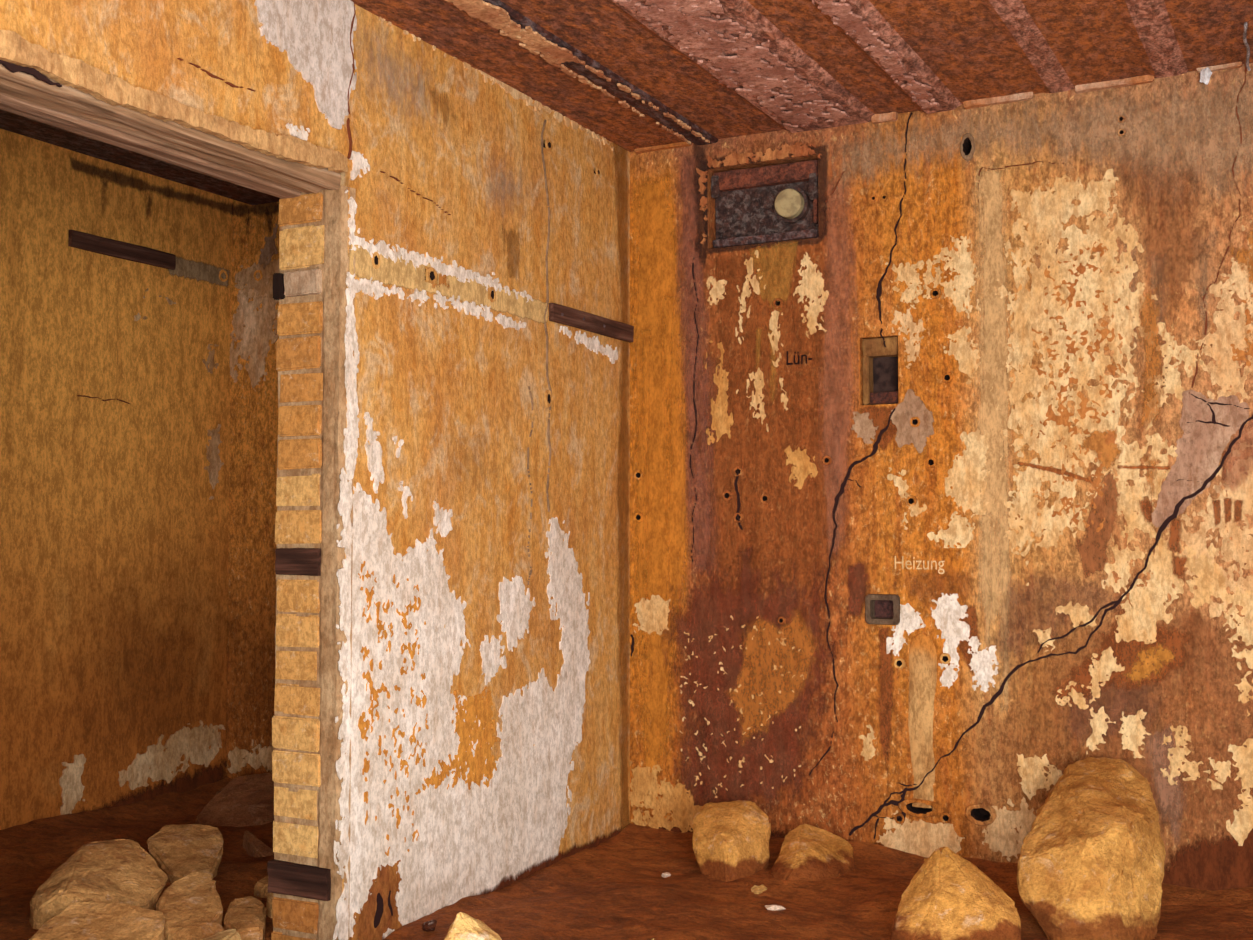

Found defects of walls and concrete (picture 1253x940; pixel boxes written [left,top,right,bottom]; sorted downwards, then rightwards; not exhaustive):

peeling [254,0,357,130]
peeling [559,326,618,364]
peeling [706,250,766,345]
peeling [705,310,789,445]
peeling [793,252,829,339]
peeling [0,30,590,940]
peeling [784,445,818,489]
crack [849,63,1253,839]
peeling [876,169,1253,862]
peeling [631,595,671,656]
crack [809,408,895,776]
peeling [629,615,800,833]